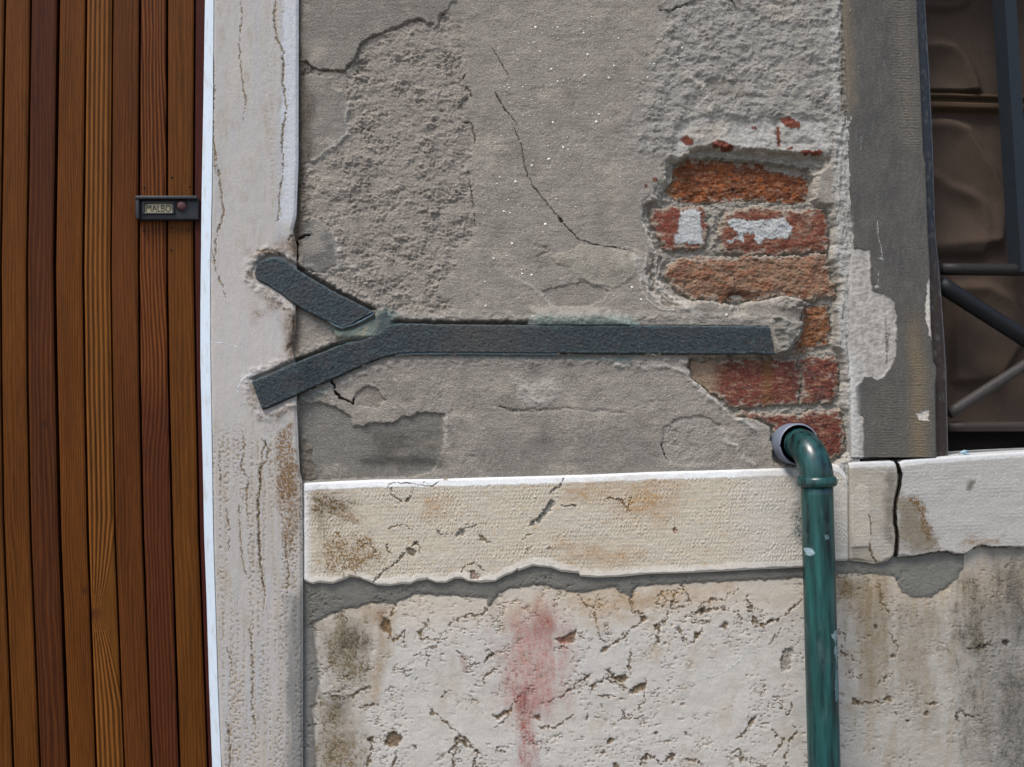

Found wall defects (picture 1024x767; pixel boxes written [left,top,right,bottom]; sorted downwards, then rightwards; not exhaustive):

crack [213,56,226,295]
spalling [294,0,476,315]
crack [462,48,634,252]
spalling [639,114,897,468]
crack [218,431,291,609]
water stain [276,464,300,552]
crack [227,630,256,725]
crack [328,686,375,708]
crack [366,731,417,767]
crack [380,585,802,767]
crack [838,515,973,722]
crack [969,640,1008,650]